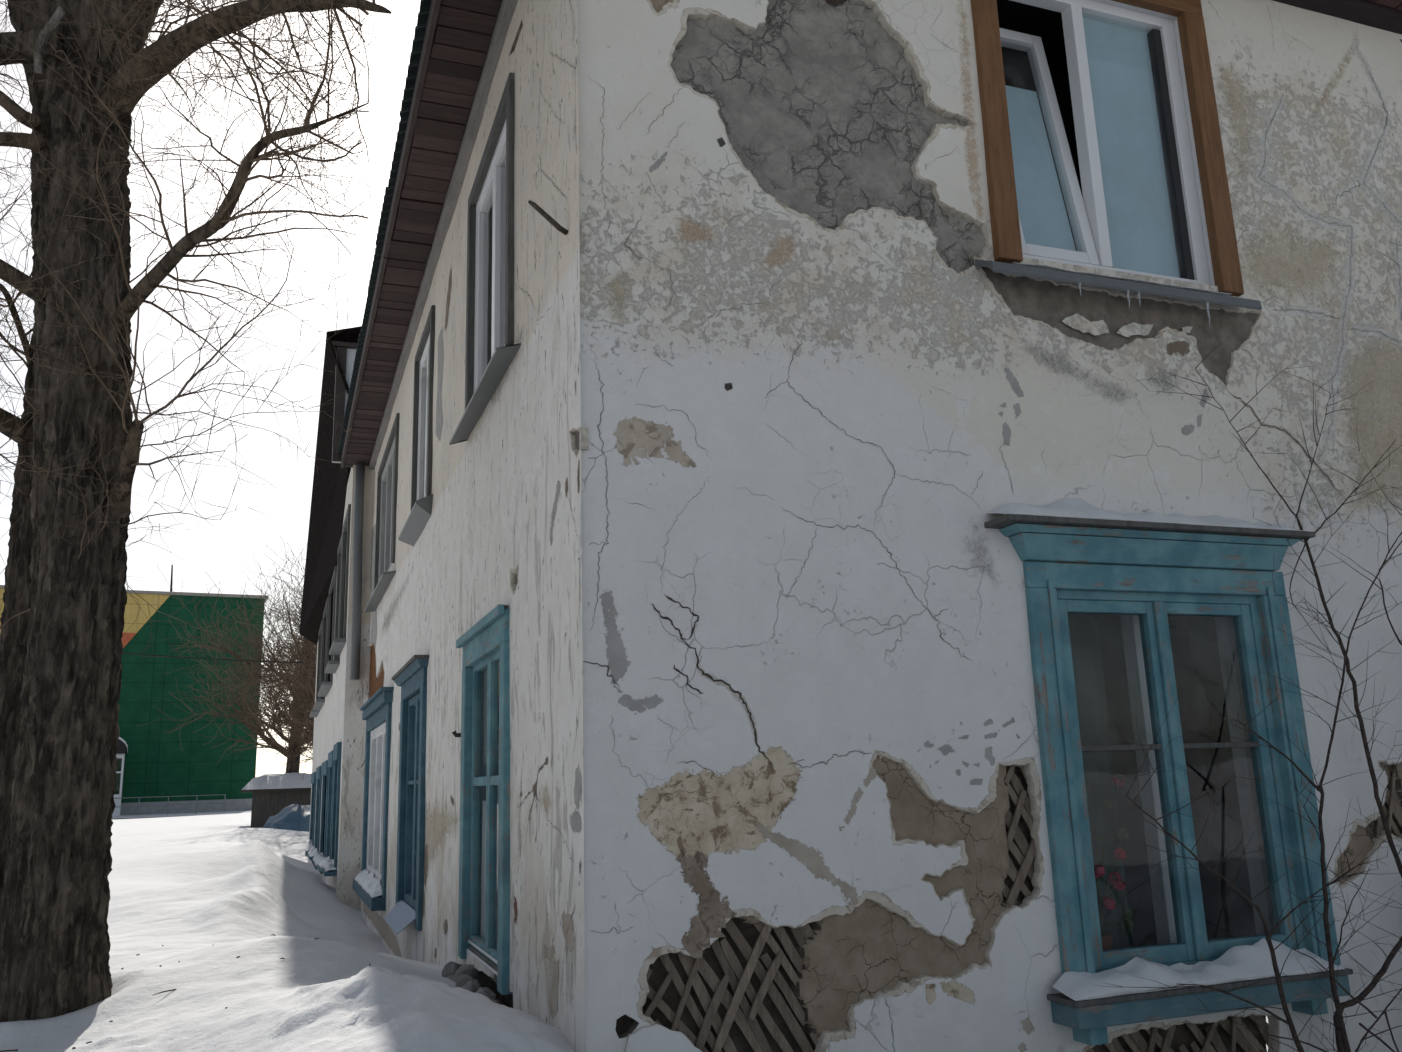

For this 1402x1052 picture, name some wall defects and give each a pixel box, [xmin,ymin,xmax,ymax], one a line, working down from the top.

crack [549,52,685,309]
spalling [646,0,1265,446]
spalling [367,523,384,700]
spalling [550,427,589,546]
peeling [613,416,696,467]
crack [518,353,873,996]
crack [767,338,1013,660]
spalling [615,718,1045,1052]
spalling [1334,760,1402,888]